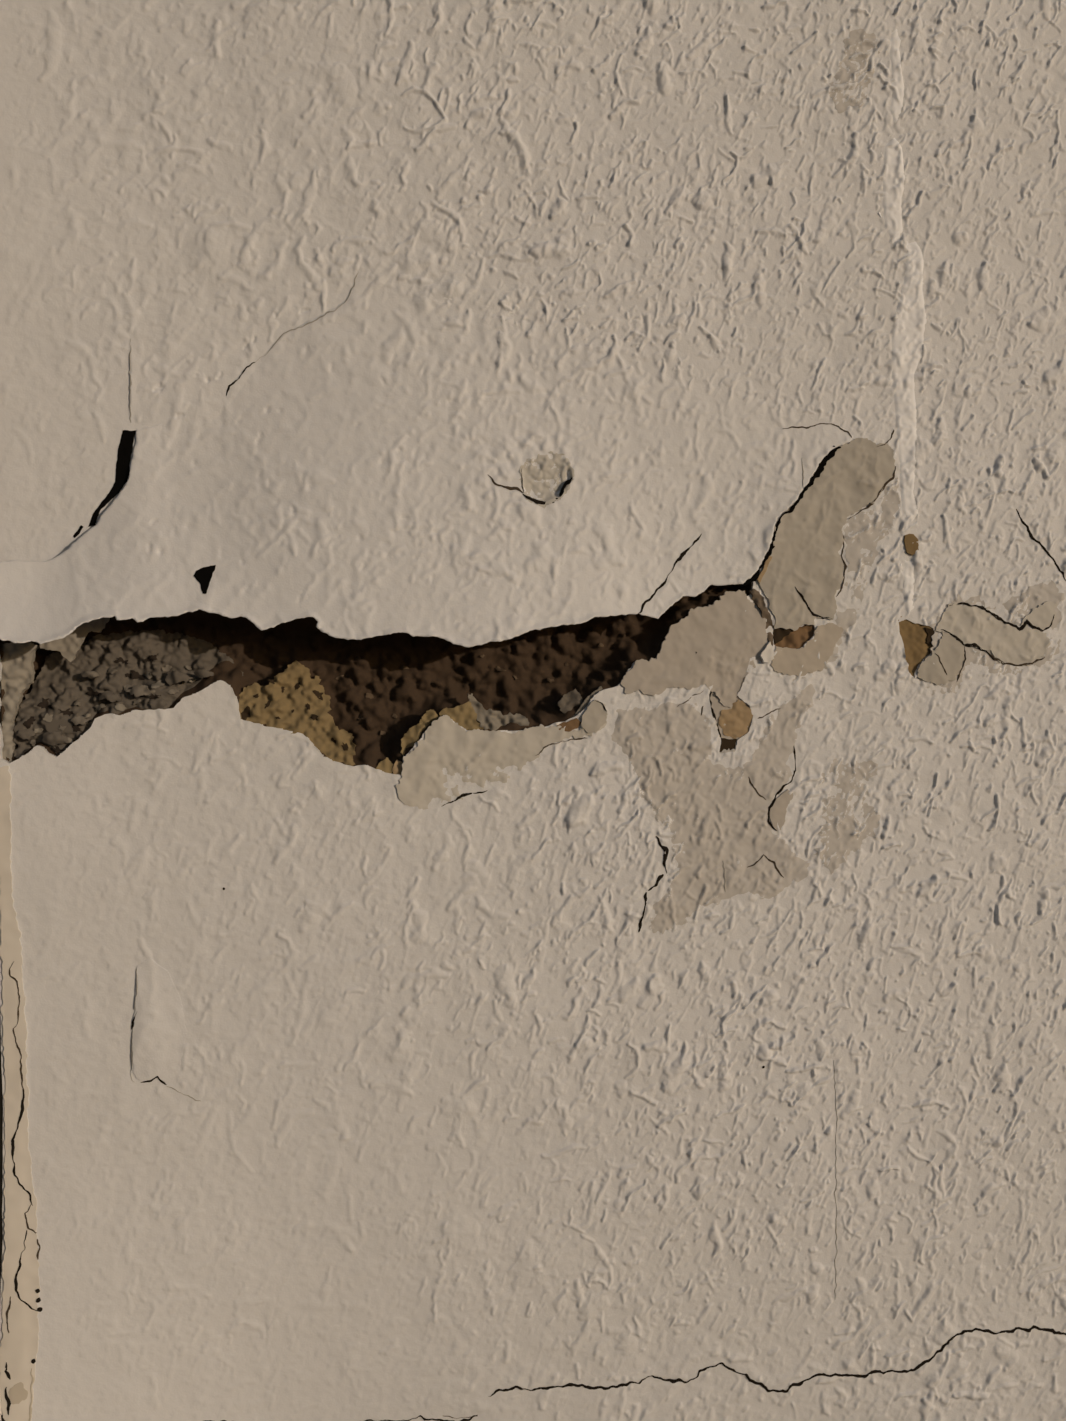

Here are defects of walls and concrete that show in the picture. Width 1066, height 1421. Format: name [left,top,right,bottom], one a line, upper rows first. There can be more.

peeling [0,285,895,810]
peeling [898,601,1057,685]
crack [130,969,200,1101]
crack [1,963,40,1421]
crack [832,1068,840,1297]
crack [365,1325,1066,1421]